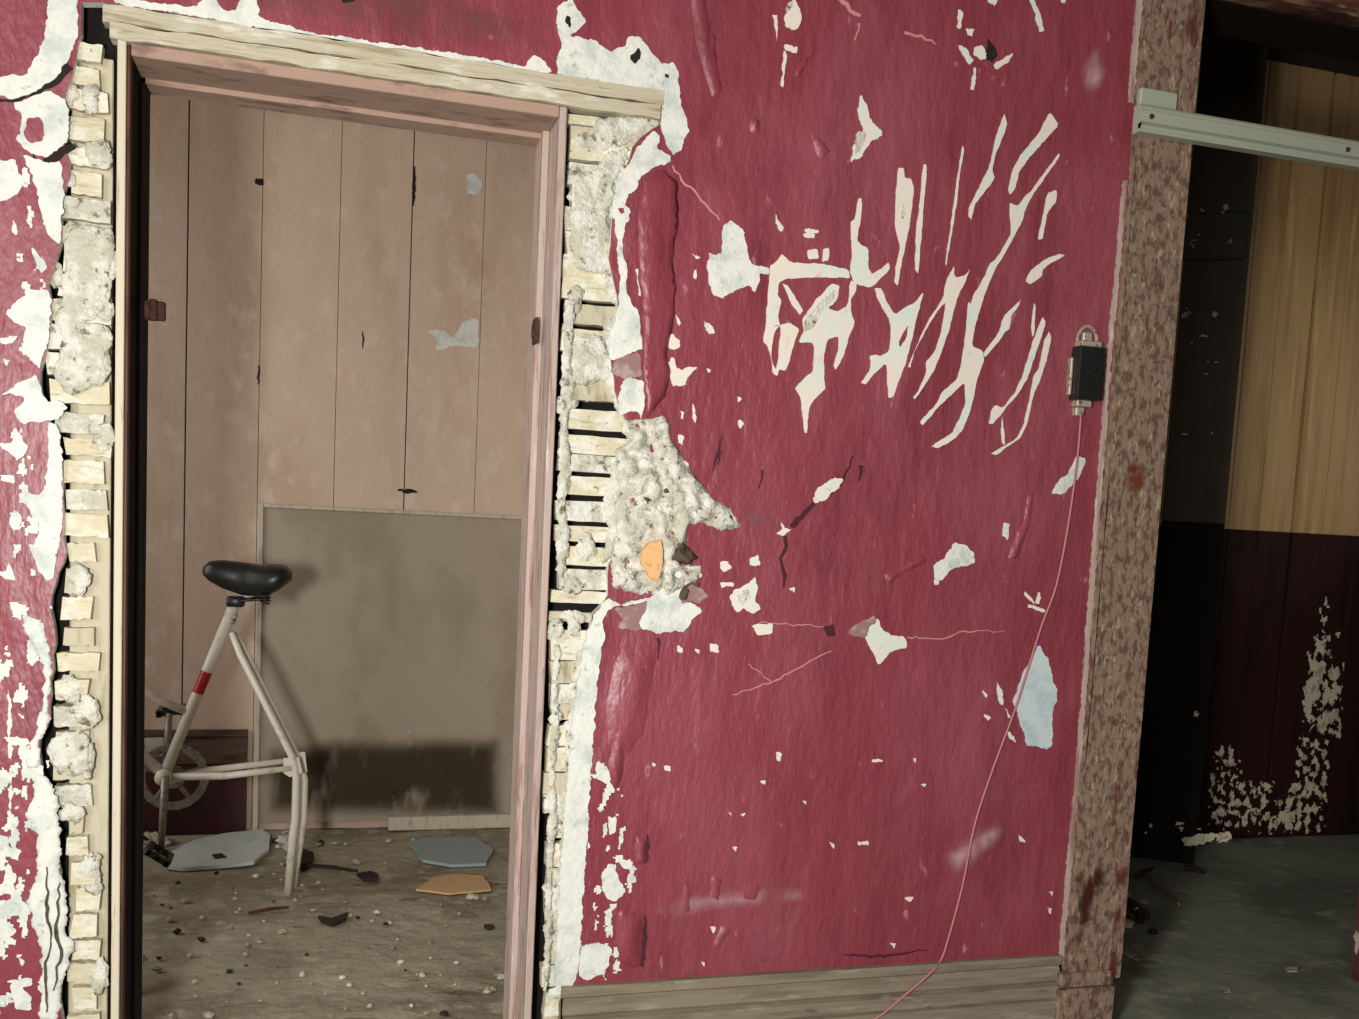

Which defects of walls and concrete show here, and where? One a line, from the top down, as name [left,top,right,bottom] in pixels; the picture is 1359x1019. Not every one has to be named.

crack [0,63,73,103]
flaking render [0,0,79,244]
crack [33,143,76,162]
peeling [851,96,882,162]
flaking render [0,248,68,581]
spalling [114,0,773,999]
crack [712,436,723,471]
crack [779,456,863,588]
crack [732,621,832,695]
flaking render [982,646,1057,749]
peeling [1176,597,1344,846]
flaking render [0,602,75,1019]